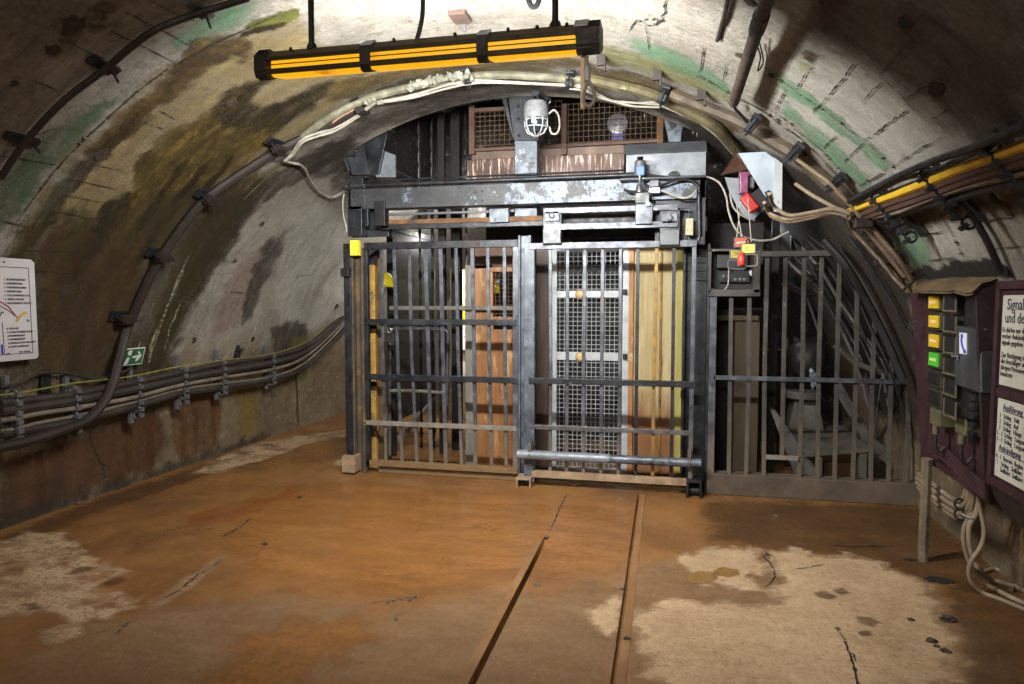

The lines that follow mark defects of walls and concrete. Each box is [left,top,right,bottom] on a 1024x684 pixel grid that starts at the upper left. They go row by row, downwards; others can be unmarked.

leakage [630,100,738,134]
leakage [2,21,672,390]
crack [154,519,249,601]
crack [763,545,963,587]
crack [834,627,860,684]